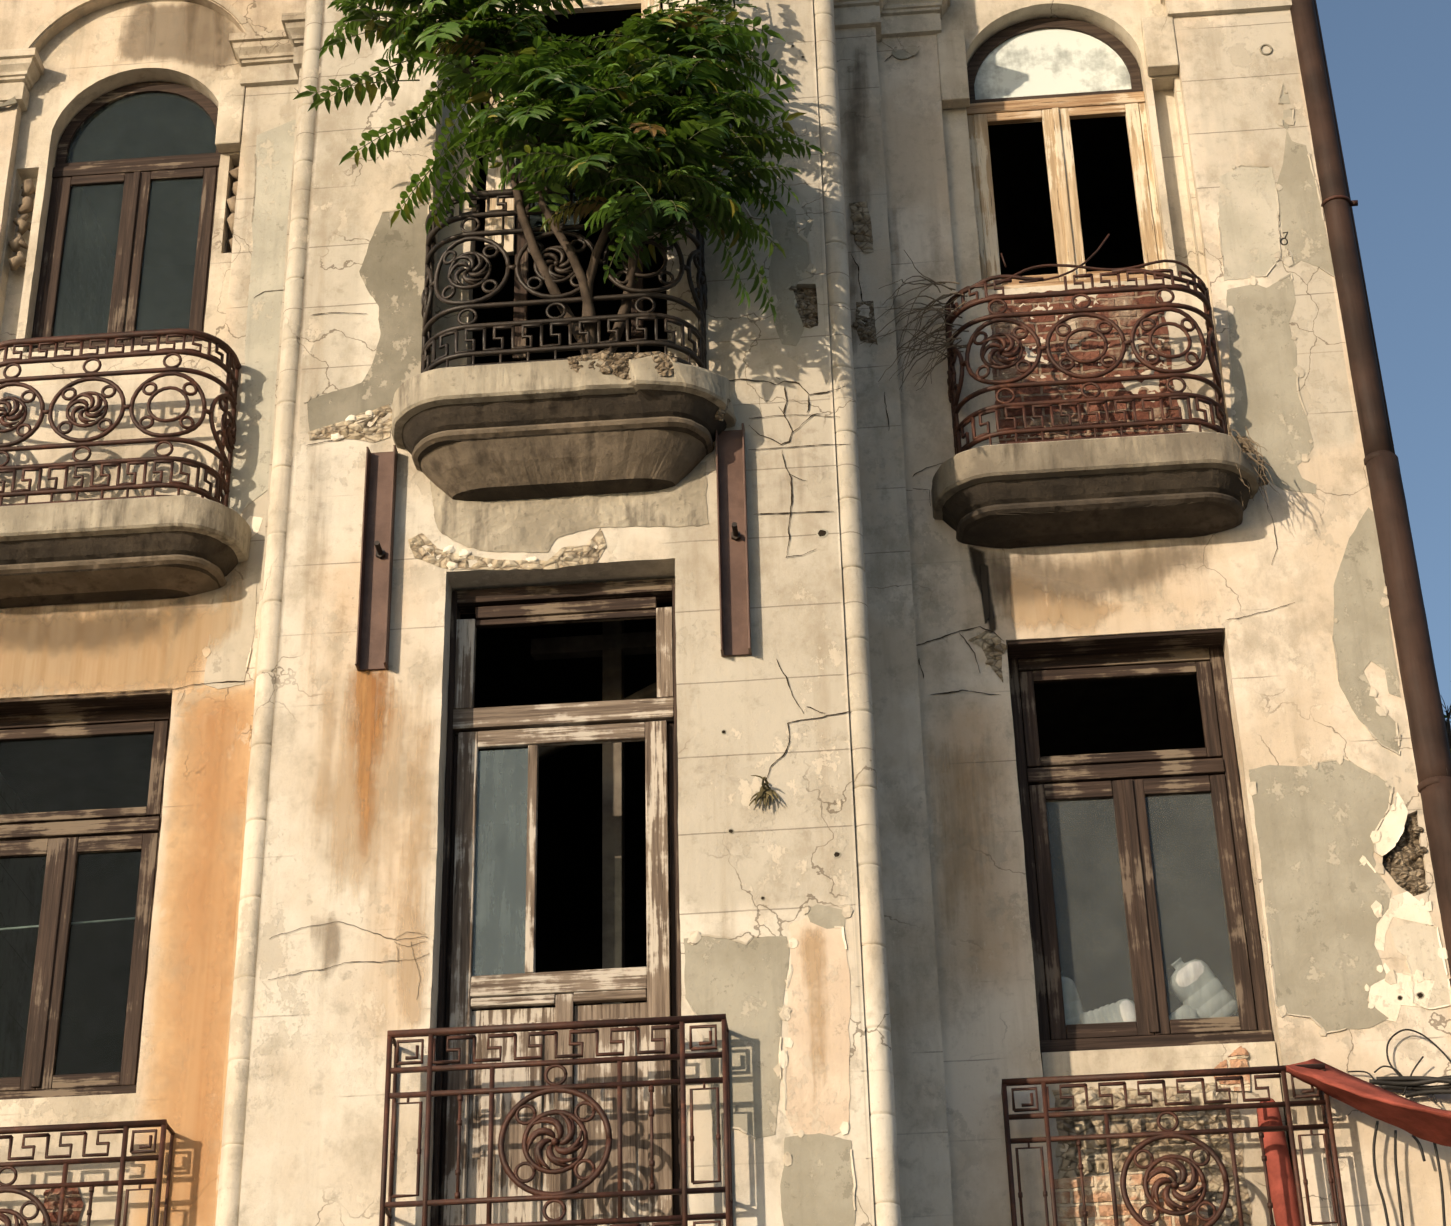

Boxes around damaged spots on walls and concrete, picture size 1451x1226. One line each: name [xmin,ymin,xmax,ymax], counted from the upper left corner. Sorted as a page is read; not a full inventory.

peeling [1218,83,1335,494]
crack [729,377,848,557]
rust [354,670,386,838]
crack [767,660,849,778]
peeling [1332,507,1401,755]
peeling [1248,754,1451,1036]
peeling [684,904,856,1226]